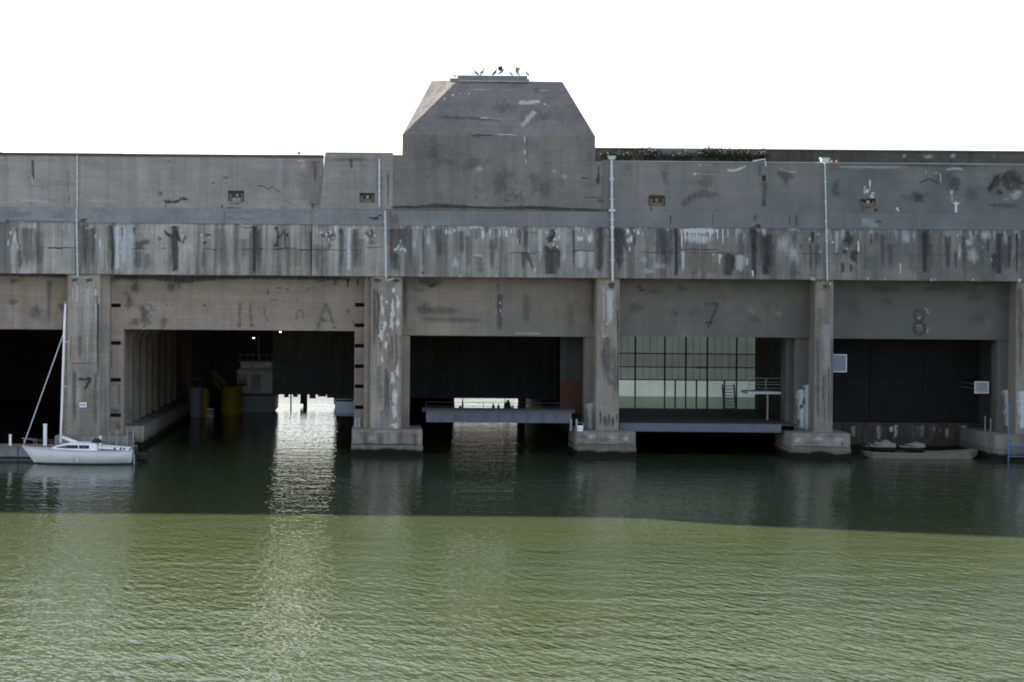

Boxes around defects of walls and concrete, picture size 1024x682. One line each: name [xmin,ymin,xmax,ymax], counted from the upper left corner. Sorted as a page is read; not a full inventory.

leakage [2,229,64,282]
leakage [82,225,359,328]
leakage [469,226,559,274]
leakage [573,227,584,268]
leakage [657,228,815,281]
leakage [900,231,1010,281]
peeling [374,277,401,429]
peeling [796,385,808,430]